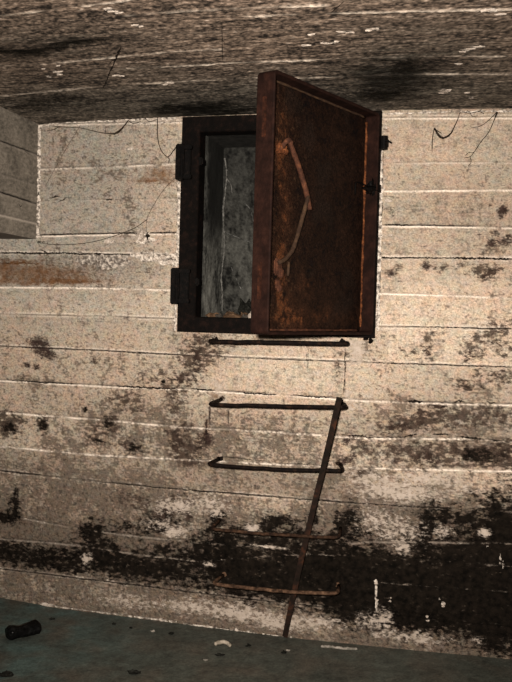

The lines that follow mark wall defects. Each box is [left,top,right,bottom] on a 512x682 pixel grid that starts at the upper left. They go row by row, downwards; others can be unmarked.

water stain [485,231,512,247]
water stain [456,264,504,282]
water stain [18,336,56,379]
water stain [450,321,512,391]
water stain [80,334,233,467]
corrosion [200,406,212,446]
corrosion [206,510,227,532]
water stain [0,403,512,658]
corrosion [330,510,354,540]